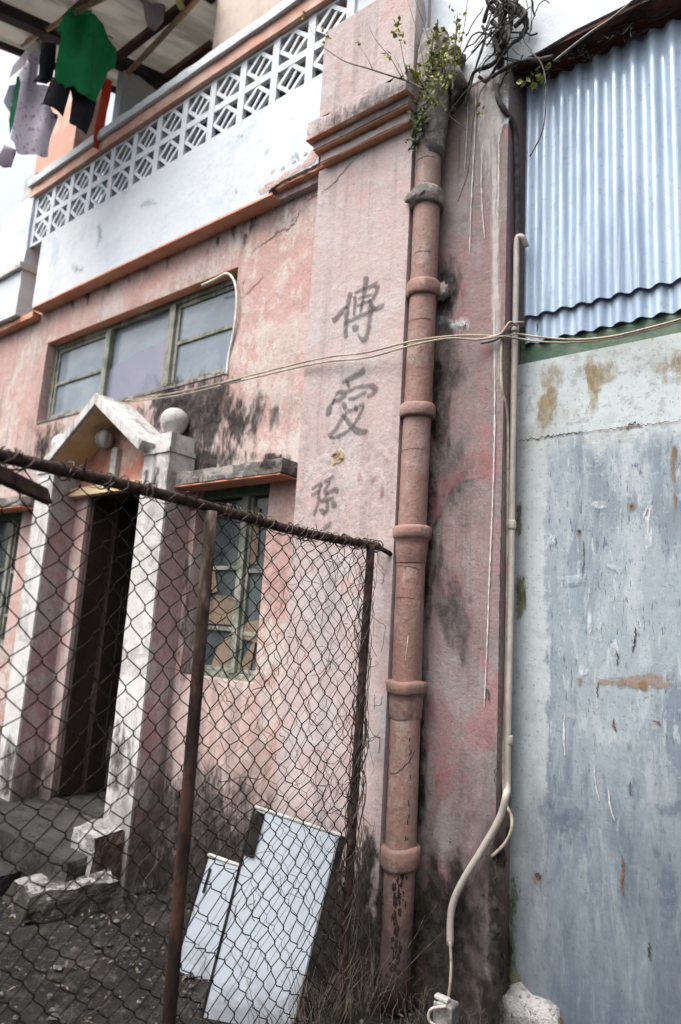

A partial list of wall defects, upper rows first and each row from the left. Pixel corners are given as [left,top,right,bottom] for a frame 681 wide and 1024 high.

peeling [258,151,317,194]
crack [242,152,363,294]
leakage [140,370,279,470]
leakage [424,563,433,620]
rust [598,674,668,691]
leakage [417,718,426,826]
leakage [410,849,503,1024]